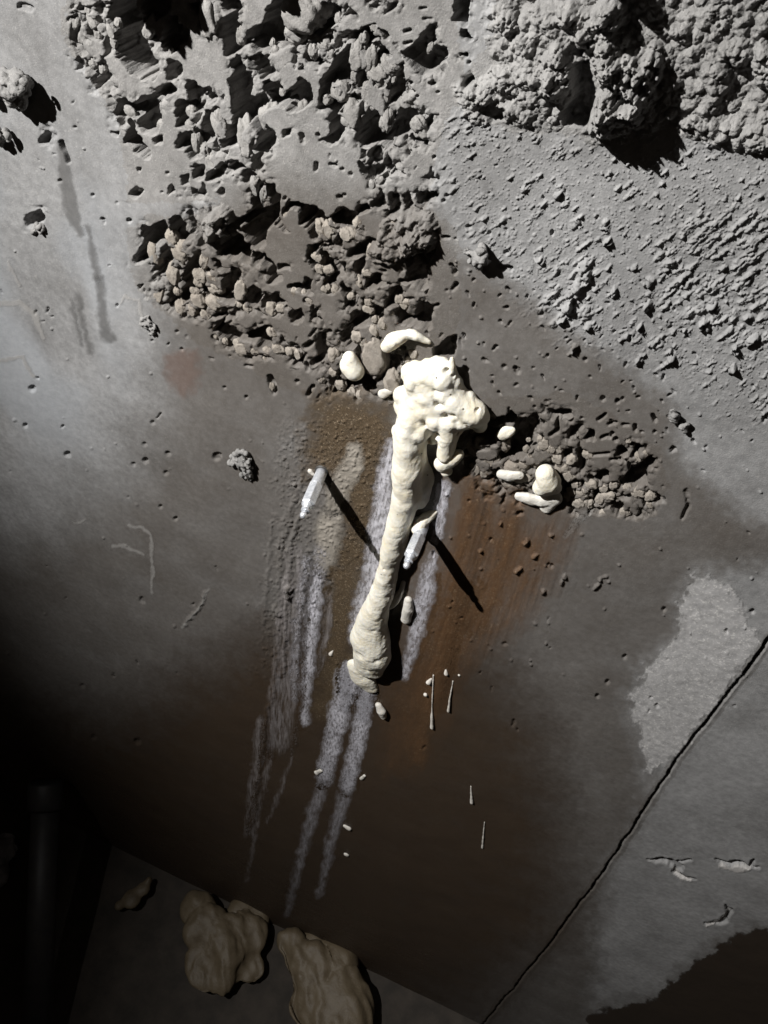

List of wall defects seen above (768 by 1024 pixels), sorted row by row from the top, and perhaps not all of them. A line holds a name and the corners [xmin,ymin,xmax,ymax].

rust [305,388,392,721]
damp [0,442,551,1002]
damp [630,576,759,774]
crack [479,631,768,1024]
damp [586,928,768,1024]
spalling [644,852,766,884]
spalling [700,899,739,932]